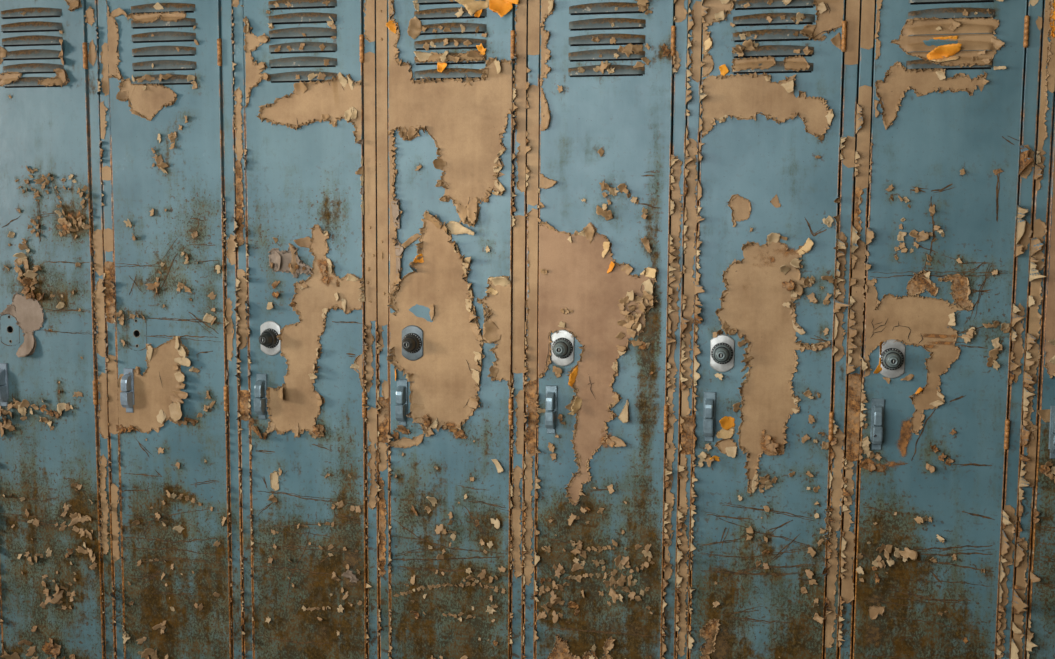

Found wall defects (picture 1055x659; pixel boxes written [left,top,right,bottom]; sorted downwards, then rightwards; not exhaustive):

peeling [0,46,22,98]
peeling [0,209,74,357]
peeling [15,0,216,610]
peeling [203,0,659,659]
peeling [661,0,1055,659]
peeling [0,381,83,438]
peeling [3,494,52,574]
peeling [302,564,393,659]